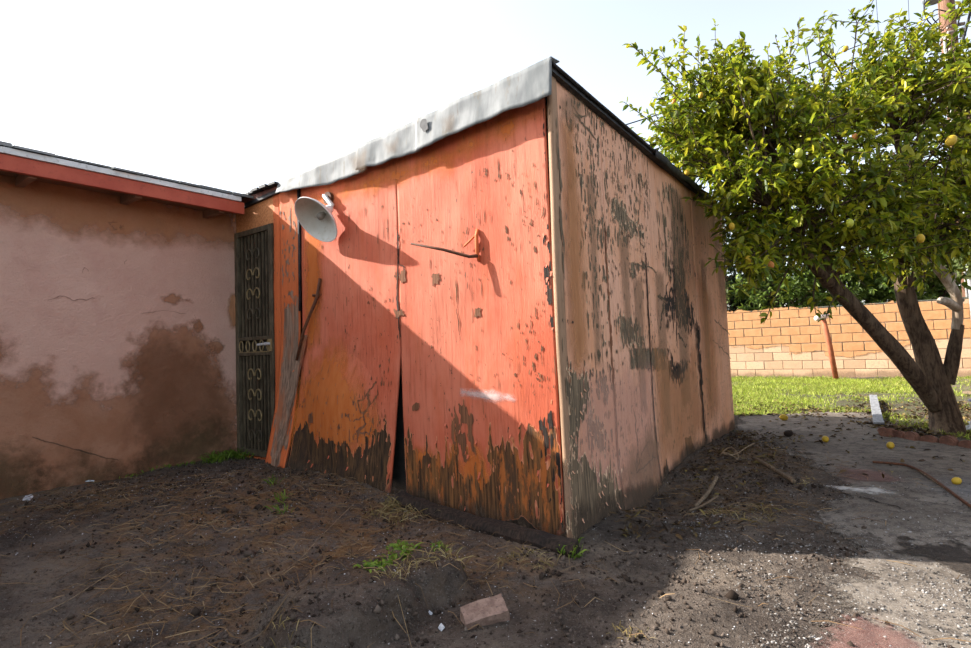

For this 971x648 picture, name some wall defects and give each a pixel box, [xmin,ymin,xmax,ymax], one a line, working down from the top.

water stain [0,320,239,500]
peeling [270,207,391,467]
peeling [444,399,477,462]
water stain [285,352,737,539]